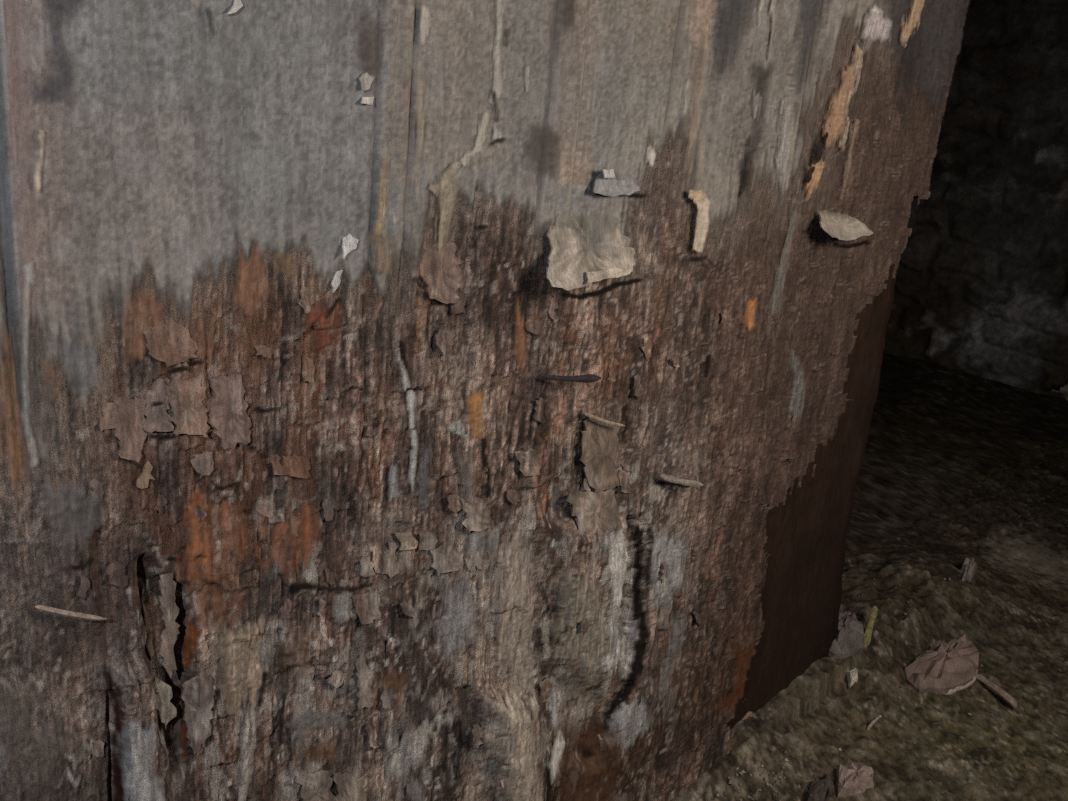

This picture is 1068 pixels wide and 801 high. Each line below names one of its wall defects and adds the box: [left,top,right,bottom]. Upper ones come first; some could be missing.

peeling [331,234,359,293]
peeling [525,218,643,335]
peeling [689,190,715,267]
peeling [818,212,873,248]
peeling [99,318,252,513]
peeling [447,495,494,532]
peeling [566,418,633,535]
peeling [152,573,217,754]
peeling [328,651,394,711]
crack [600,526,653,733]
peeling [295,770,368,801]
crack [545,763,557,801]